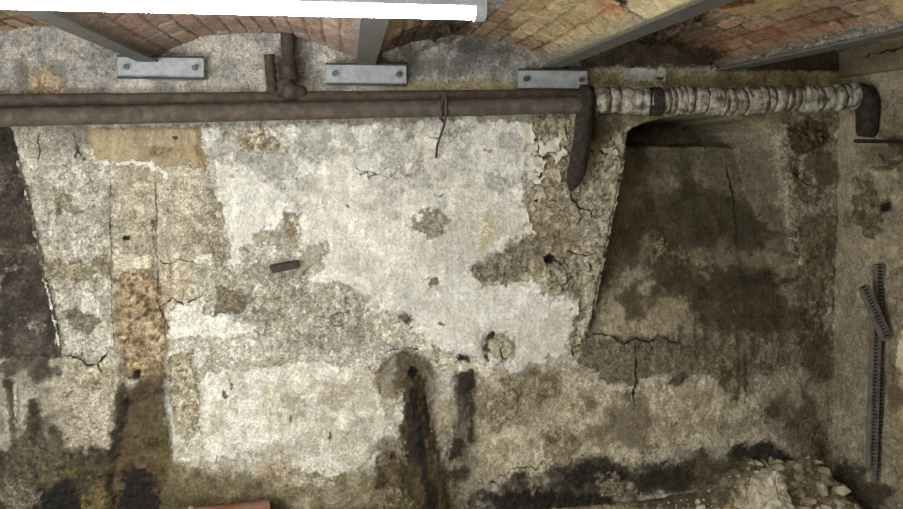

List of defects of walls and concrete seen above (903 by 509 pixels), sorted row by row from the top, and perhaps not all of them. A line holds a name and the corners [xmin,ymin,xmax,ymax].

flaking render [719,0,757,9]
spalling [630,11,716,65]
spalling [747,21,903,62]
crack [861,47,903,58]
leakage [0,243,42,292]
peeling [16,114,697,489]
leakage [371,145,837,509]
crack [571,333,678,410]
leakage [0,355,289,509]